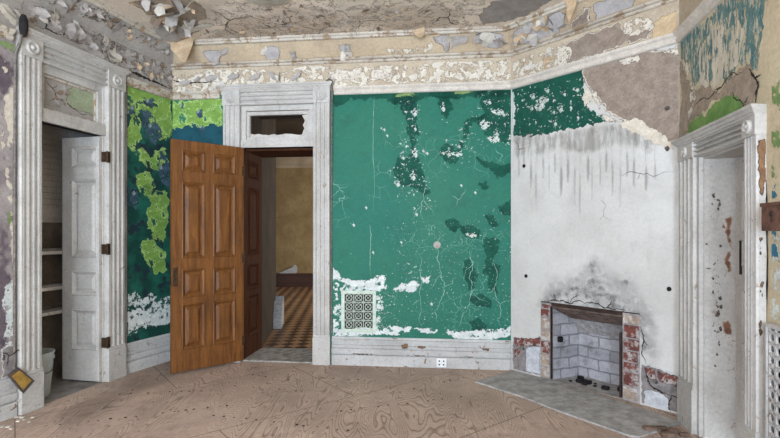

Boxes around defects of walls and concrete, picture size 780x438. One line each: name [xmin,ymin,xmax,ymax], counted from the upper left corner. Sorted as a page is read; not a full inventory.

crack [693,68,761,110]
flaking render [0,0,767,275]
corrosion [722,217,732,272]
peeling [2,280,13,345]
peeling [127,292,170,334]
peeling [333,199,541,376]
crack [459,251,507,326]
crack [547,294,626,311]
flaking render [640,364,678,412]